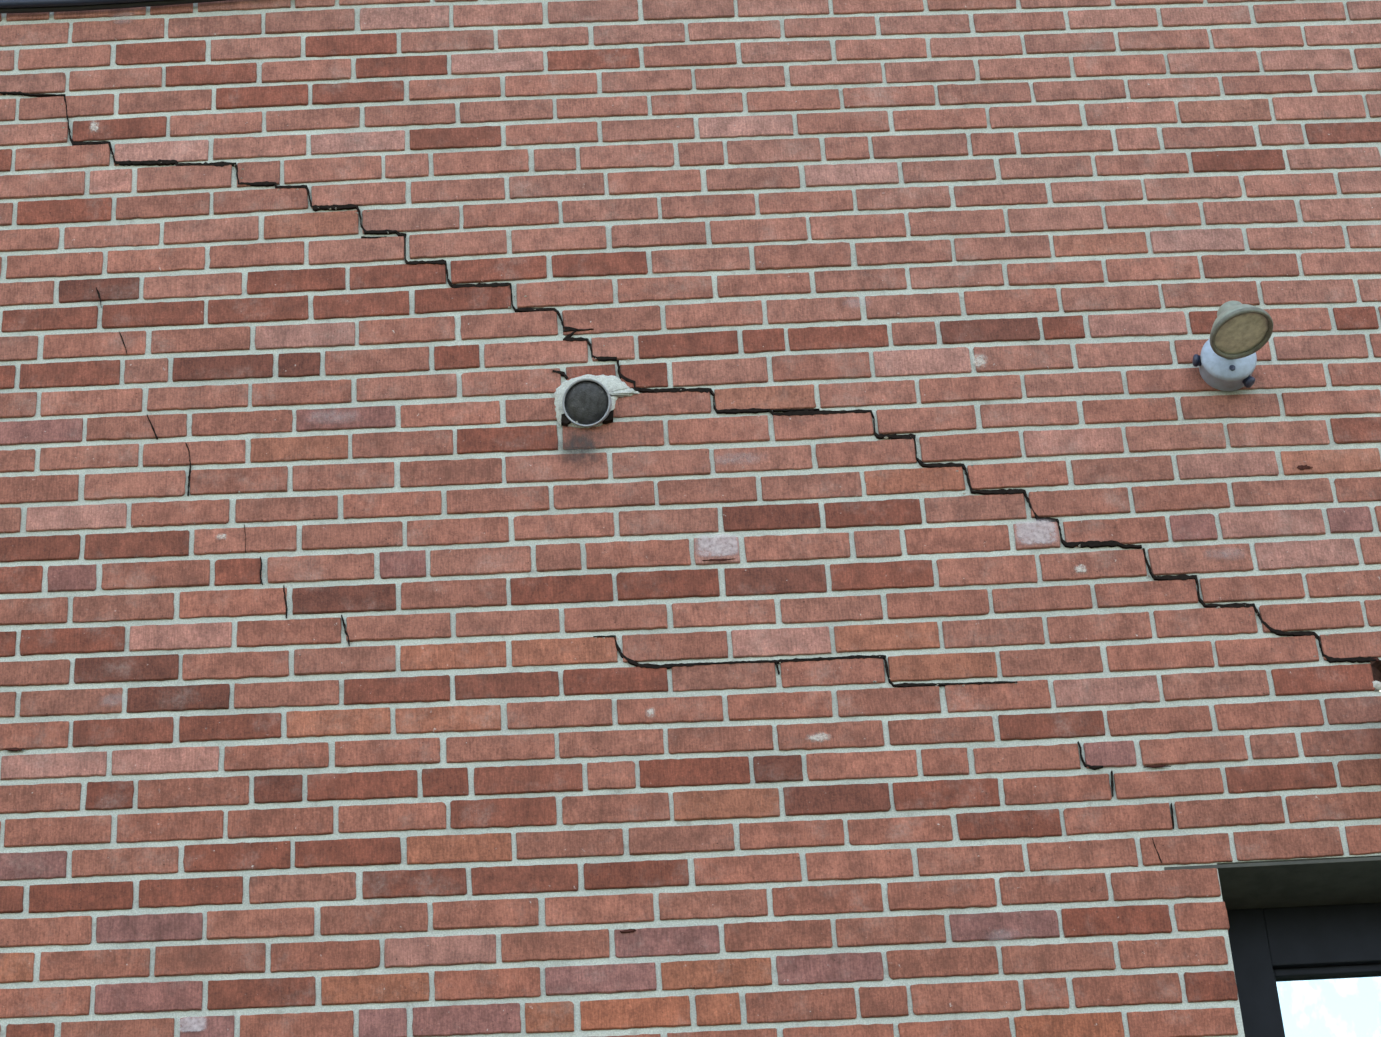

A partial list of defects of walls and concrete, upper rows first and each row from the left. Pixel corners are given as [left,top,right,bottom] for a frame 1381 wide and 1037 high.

crack [0,91,1376,663]
crack [593,635,1017,689]